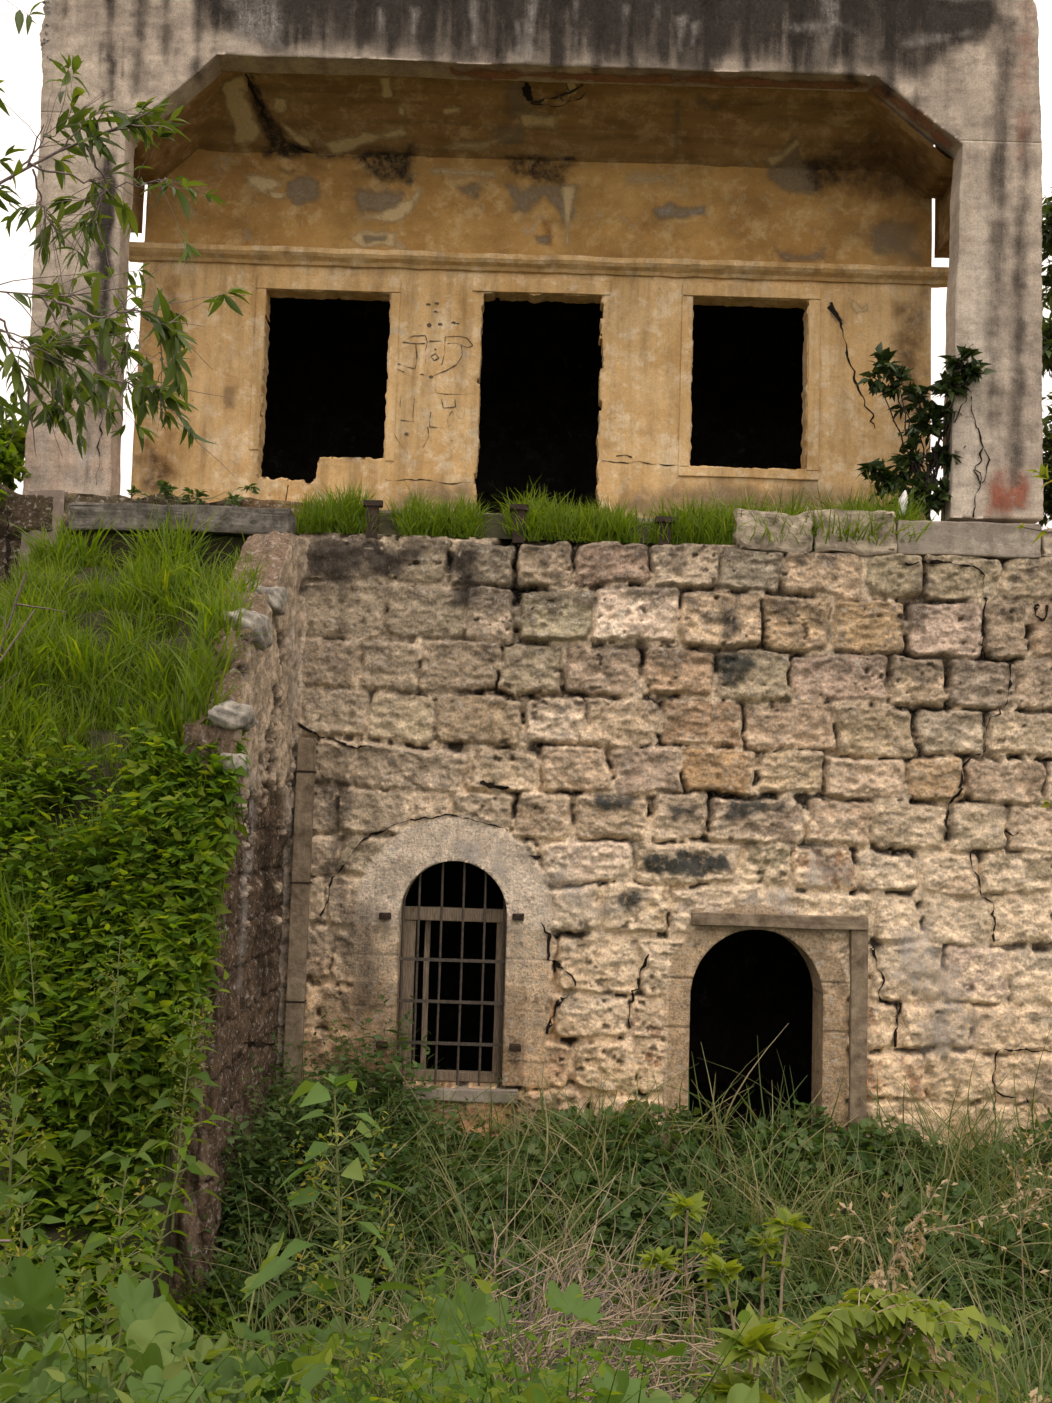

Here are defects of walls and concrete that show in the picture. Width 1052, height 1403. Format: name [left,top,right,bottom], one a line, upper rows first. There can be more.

peeling [222,76,260,144]
peeling [273,77,406,154]
water stain [195,0,1025,200]
peeling [449,68,952,149]
peeling [352,189,421,248]
peeling [432,169,576,244]
crack [827,302,875,428]
water stain [1011,306,1025,478]
crack [971,396,990,517]
crack [541,923,576,1034]
crack [628,954,650,1029]
crack [871,947,902,1047]